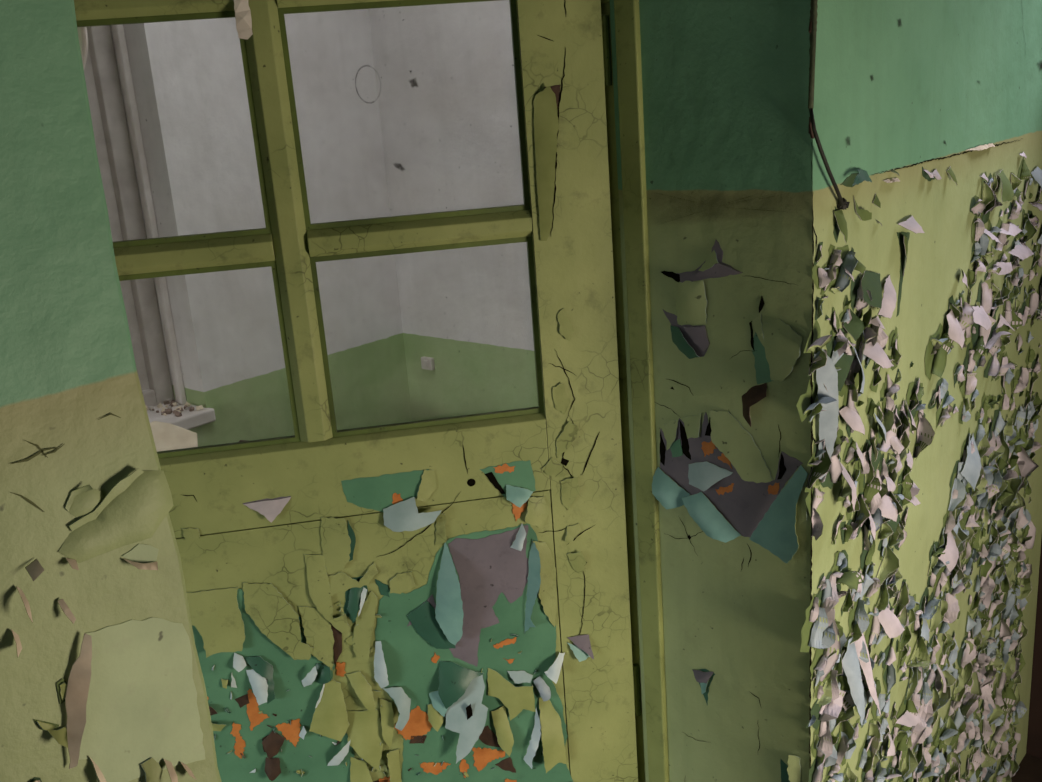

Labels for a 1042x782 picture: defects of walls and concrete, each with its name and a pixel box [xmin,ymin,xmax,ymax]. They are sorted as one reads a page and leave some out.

peeling [11,629,22,658]
peeling [25,559,44,581]
peeling [34,447,594,782]
peeling [652,139,1042,782]